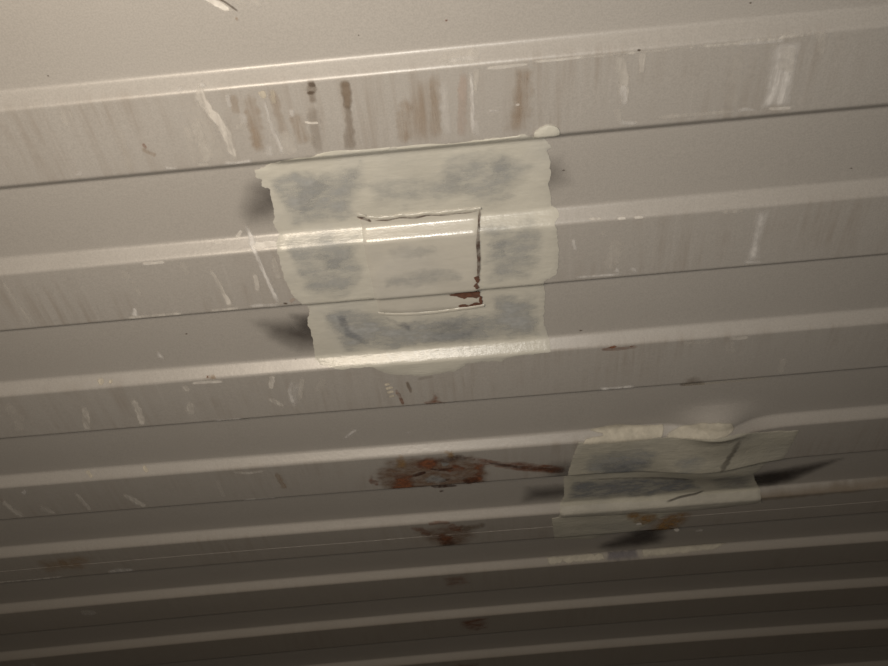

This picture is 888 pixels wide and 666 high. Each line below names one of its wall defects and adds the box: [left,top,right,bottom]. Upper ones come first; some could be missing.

water stain [341,82,351,108]
corrosion [450,276,483,307]
corrosion [376,457,560,492]